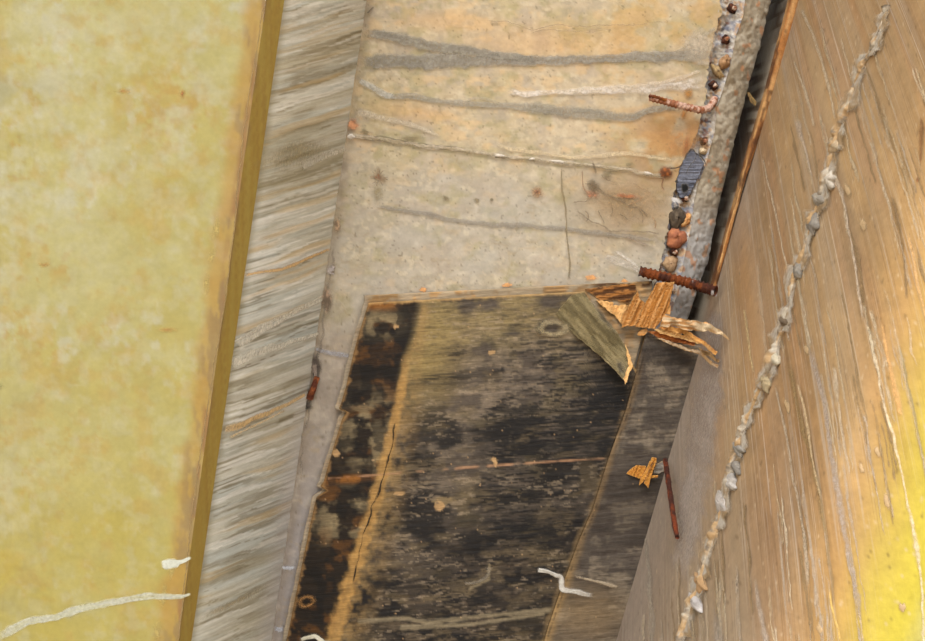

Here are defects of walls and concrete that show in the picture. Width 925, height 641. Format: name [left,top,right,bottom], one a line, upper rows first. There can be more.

damp [360,28,715,121]
corrosion [659,163,683,190]
spalling [641,0,745,344]
damp [234,297,322,366]
crack [353,424,395,580]
damp [743,506,777,641]